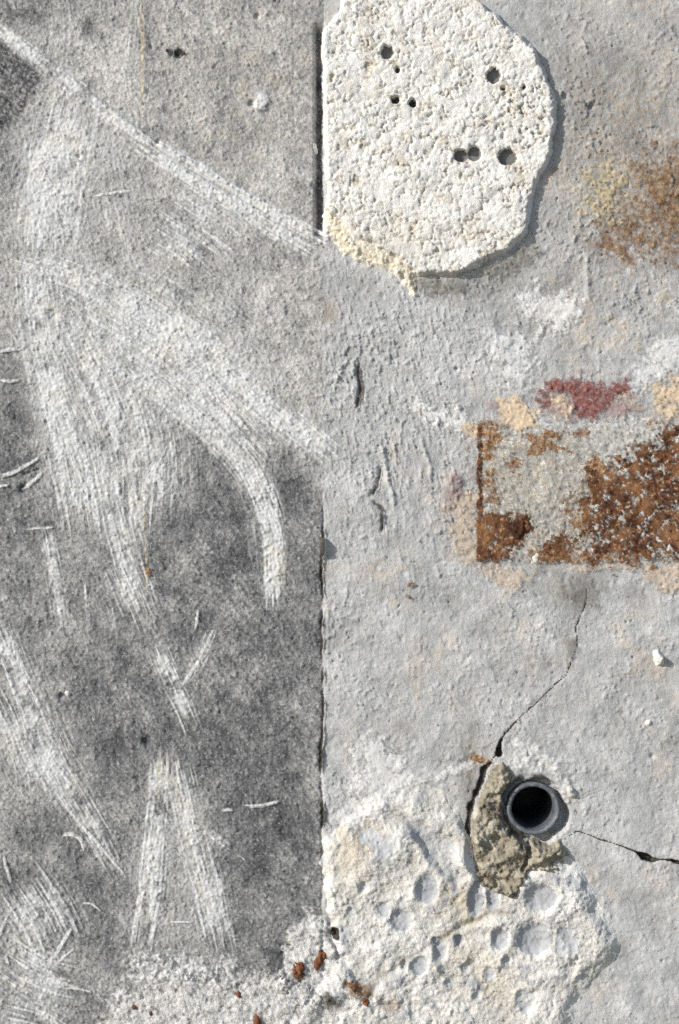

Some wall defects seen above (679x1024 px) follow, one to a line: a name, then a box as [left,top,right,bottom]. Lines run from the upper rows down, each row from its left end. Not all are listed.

corrosion [474,420,679,576]
crack [465,588,587,857]
spalling [470,762,568,899]
crack [564,831,679,864]